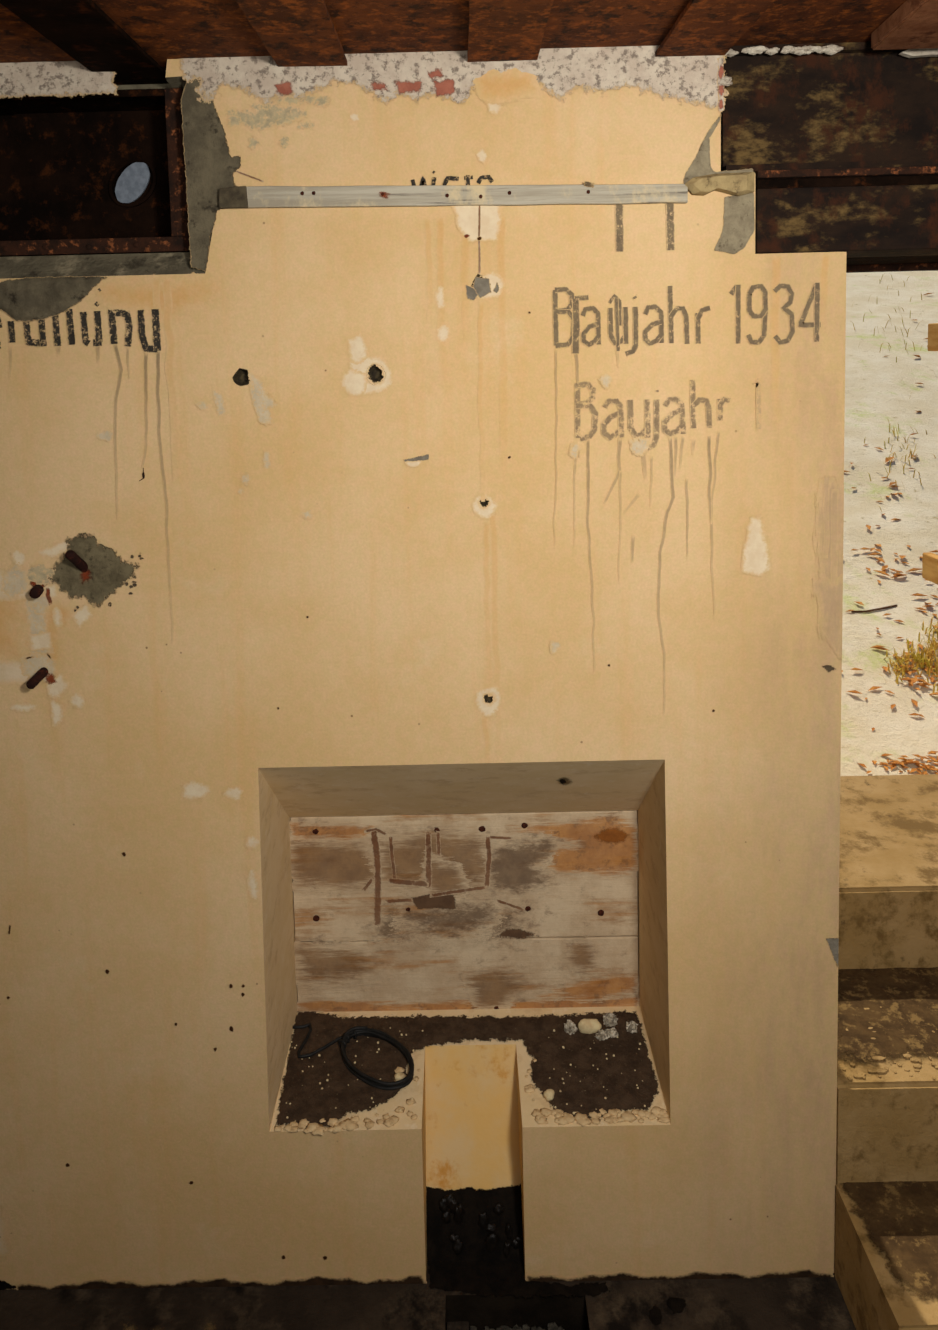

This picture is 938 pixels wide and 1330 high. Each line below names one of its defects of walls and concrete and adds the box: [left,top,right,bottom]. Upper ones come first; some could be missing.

flaking render [177,45,729,113]
flaking render [1,532,144,629]
leakage [95,344,174,645]
leakage [553,350,720,715]
peeling [740,513,772,577]